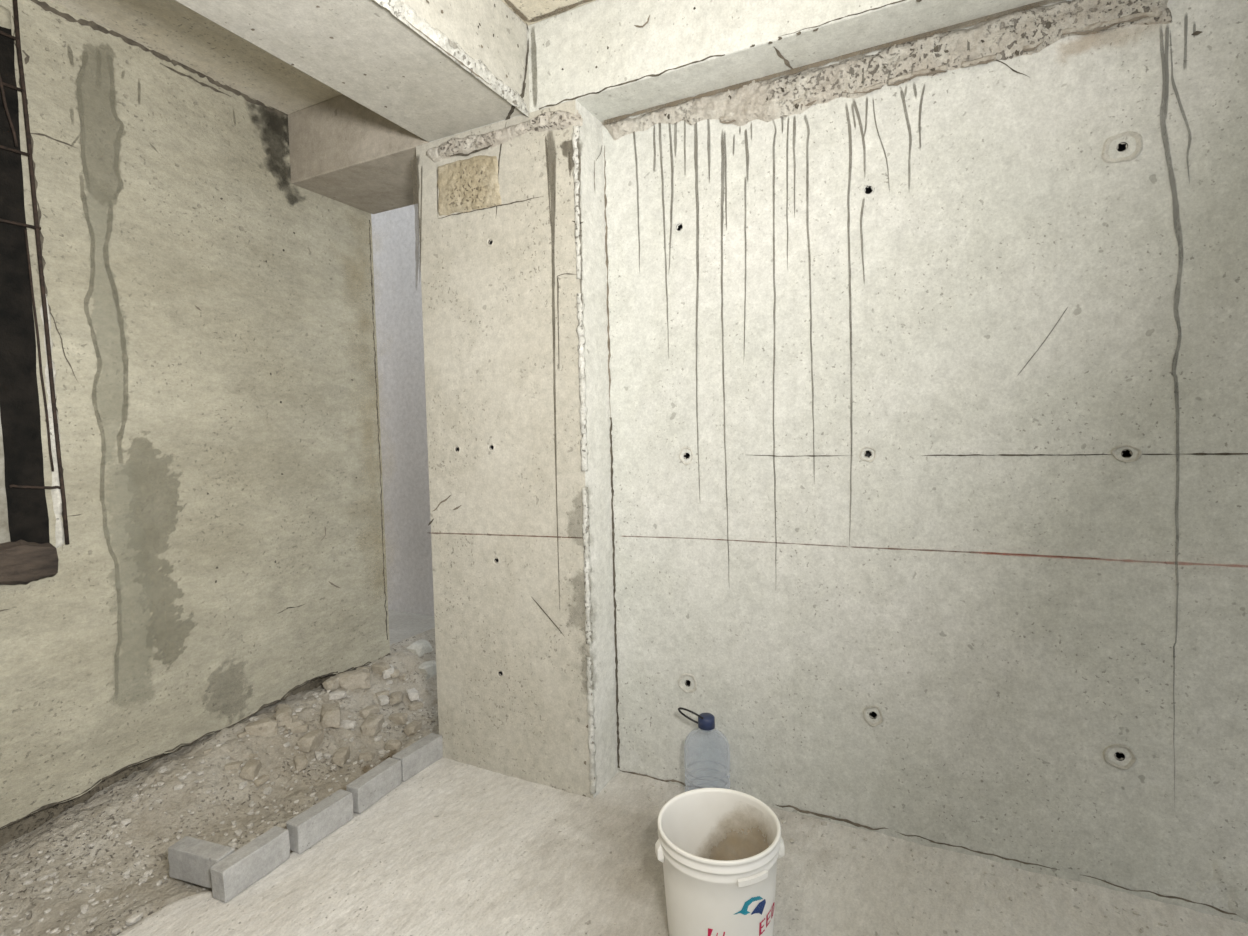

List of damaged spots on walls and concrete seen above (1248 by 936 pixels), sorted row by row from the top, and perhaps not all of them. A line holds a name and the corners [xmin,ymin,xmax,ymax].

flaking render [0,5,12,29]
leakage [251,104,298,205]
spalling [750,0,922,69]
leakage [901,63,925,186]
flaking render [40,298,65,548]
leakage [68,45,194,700]
leakage [653,119,752,562]
leakage [773,116,815,563]
leakage [846,98,889,534]
flaking render [0,653,390,829]